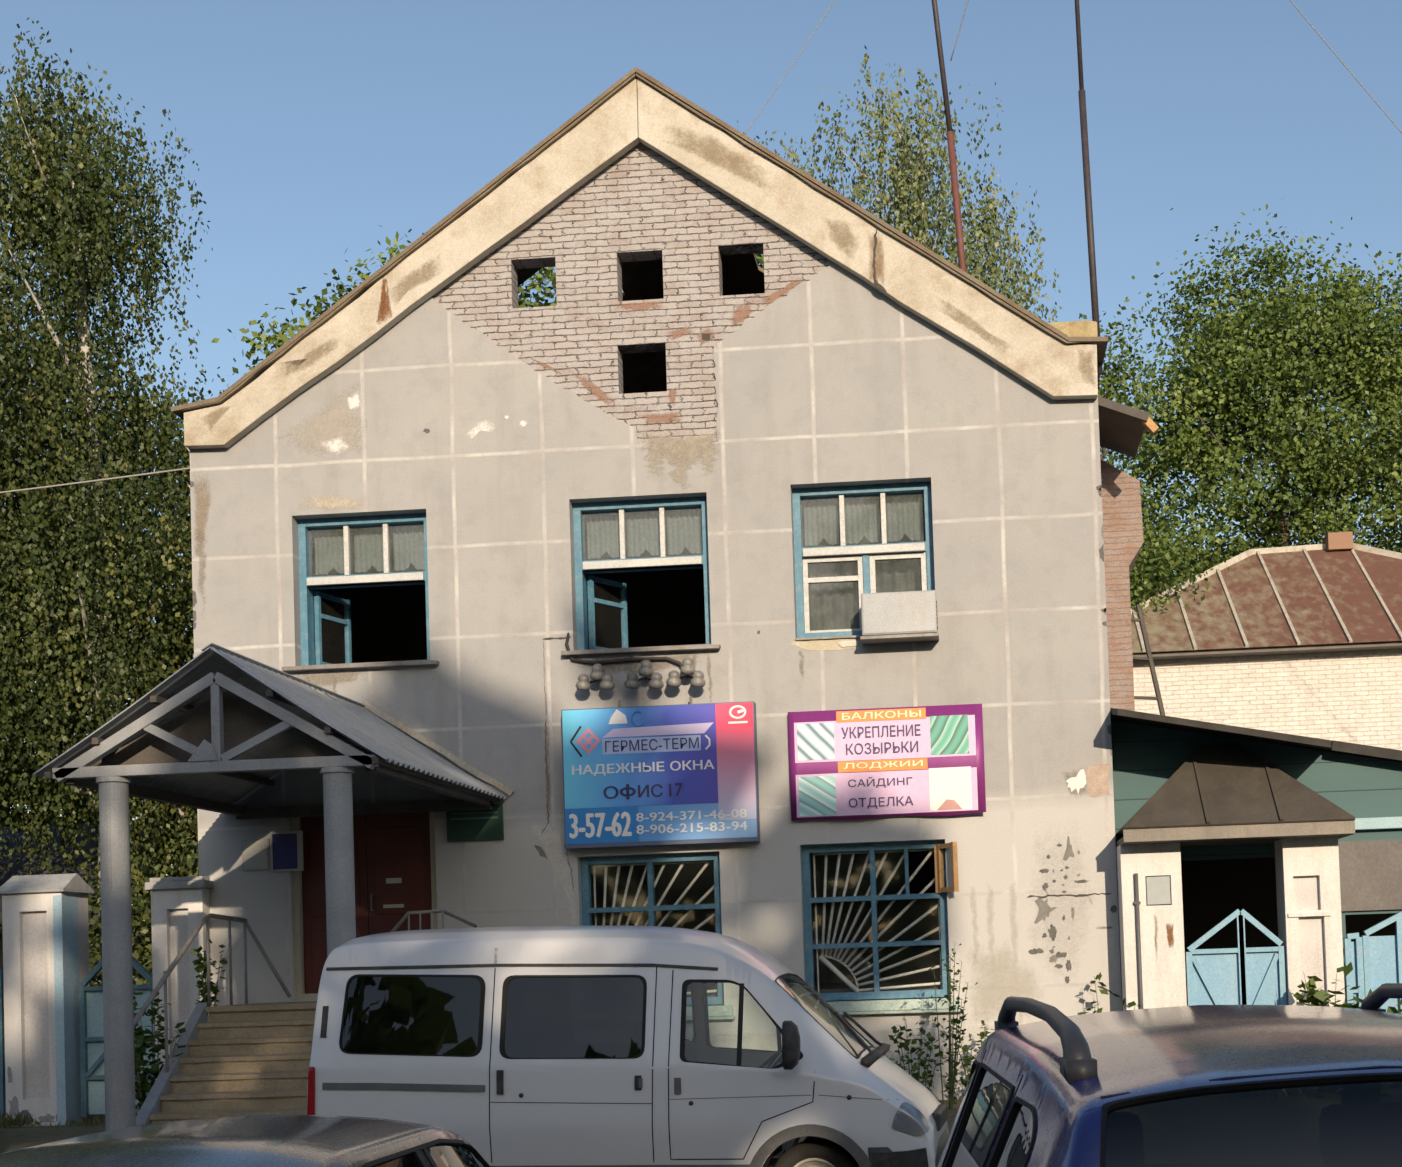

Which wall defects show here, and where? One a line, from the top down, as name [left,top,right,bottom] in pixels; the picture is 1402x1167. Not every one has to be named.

corrosion [378,280,391,321]
spalling [733,306,751,323]
spalling [766,281,799,304]
spalling [672,329,712,344]
spalling [576,375,608,403]
spalling [647,391,680,423]
flaking render [1066,724,1112,798]
peeling [1028,836,1087,984]